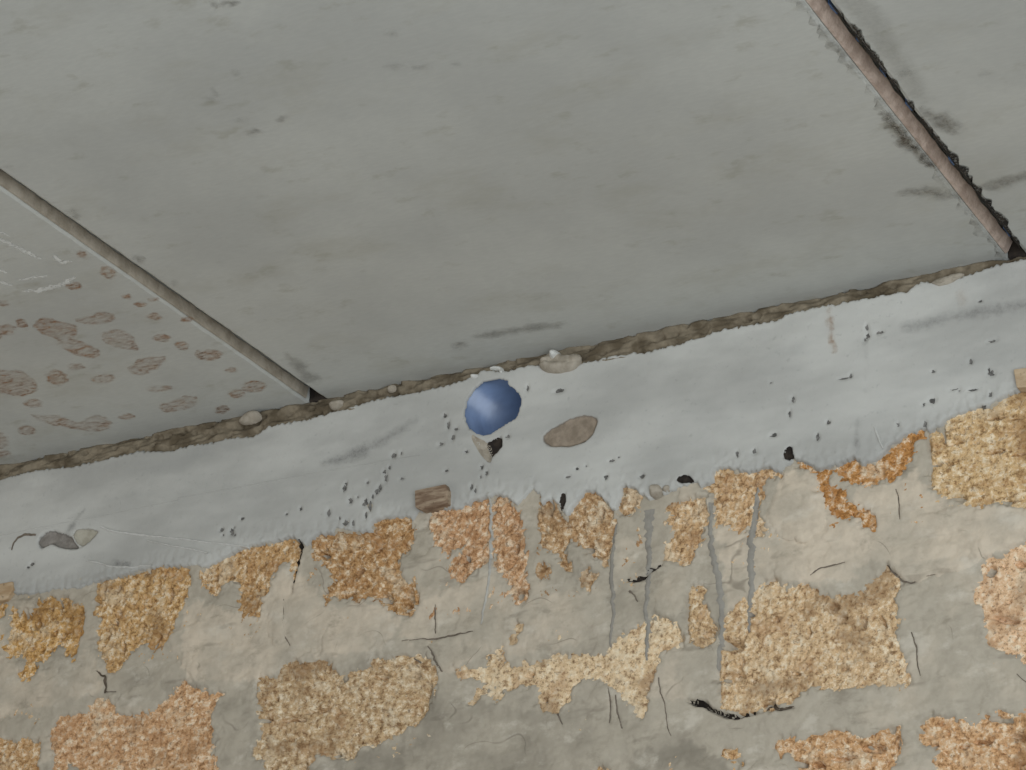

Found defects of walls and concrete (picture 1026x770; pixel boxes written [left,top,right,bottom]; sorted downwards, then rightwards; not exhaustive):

water stain [830,4,1021,249]
spalling [327,452,404,526]
spalling [465,434,510,493]
spalling [677,475,694,483]
spalling [783,446,794,460]
spalling [39,529,98,549]
crack [627,564,663,602]
crack [658,677,794,736]